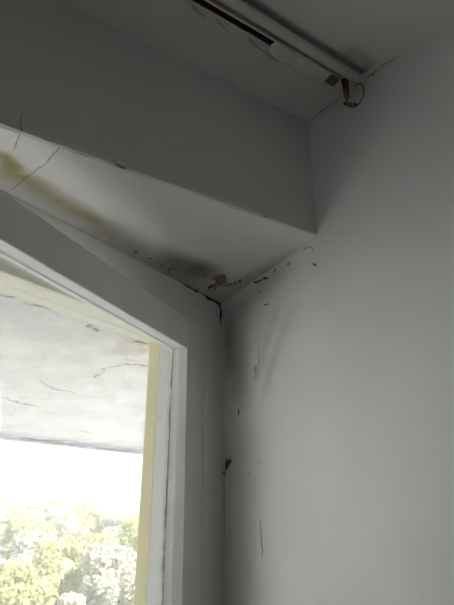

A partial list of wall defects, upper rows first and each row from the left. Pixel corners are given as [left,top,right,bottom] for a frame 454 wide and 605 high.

crack [12,147,60,190]
crack [183,277,268,326]